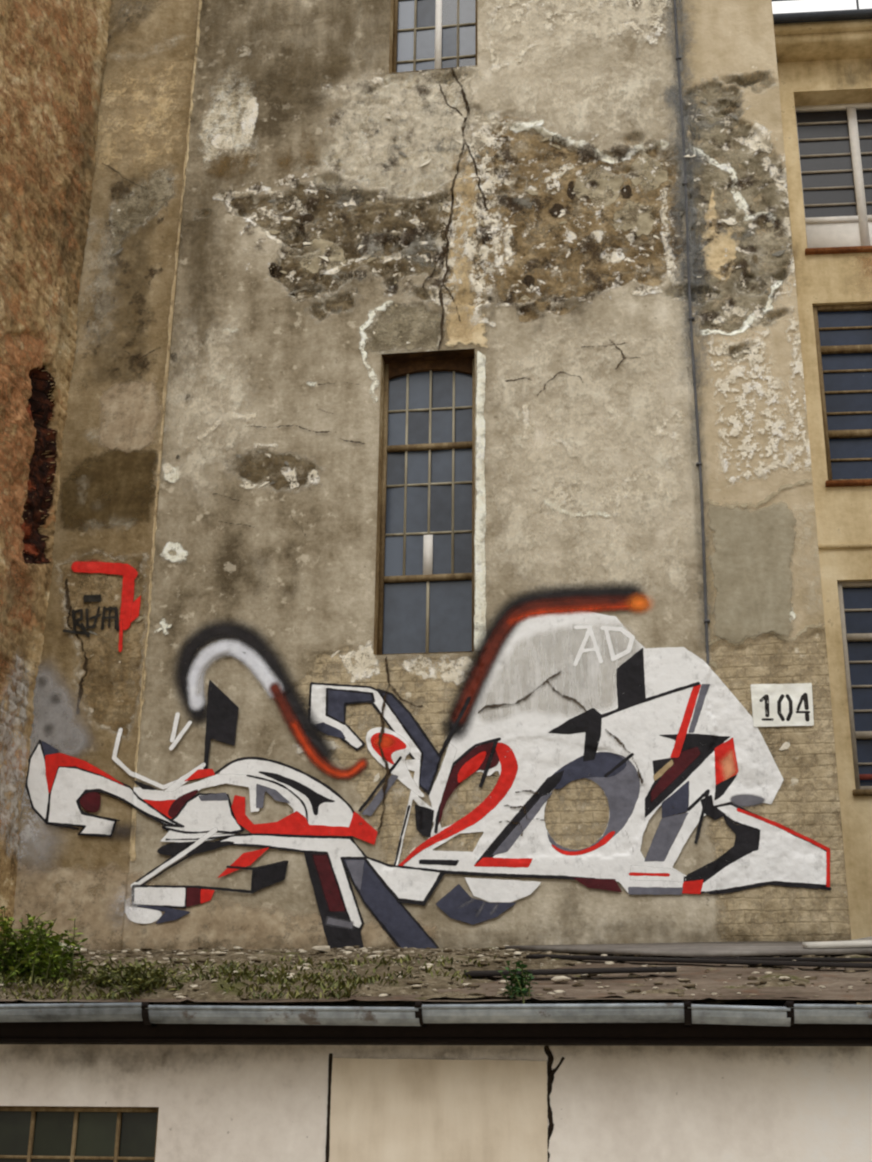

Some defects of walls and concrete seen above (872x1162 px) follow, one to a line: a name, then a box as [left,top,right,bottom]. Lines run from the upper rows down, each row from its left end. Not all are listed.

water stain [277,0,479,188]
crack [422,67,488,350]
water stain [174,327,254,494]
flaking render [0,0,812,787]
peeling [129,808,137,861]
flaking render [320,703,425,865]
flaking render [442,771,500,851]
flaking render [544,778,609,850]
crack [544,1046,565,1162]